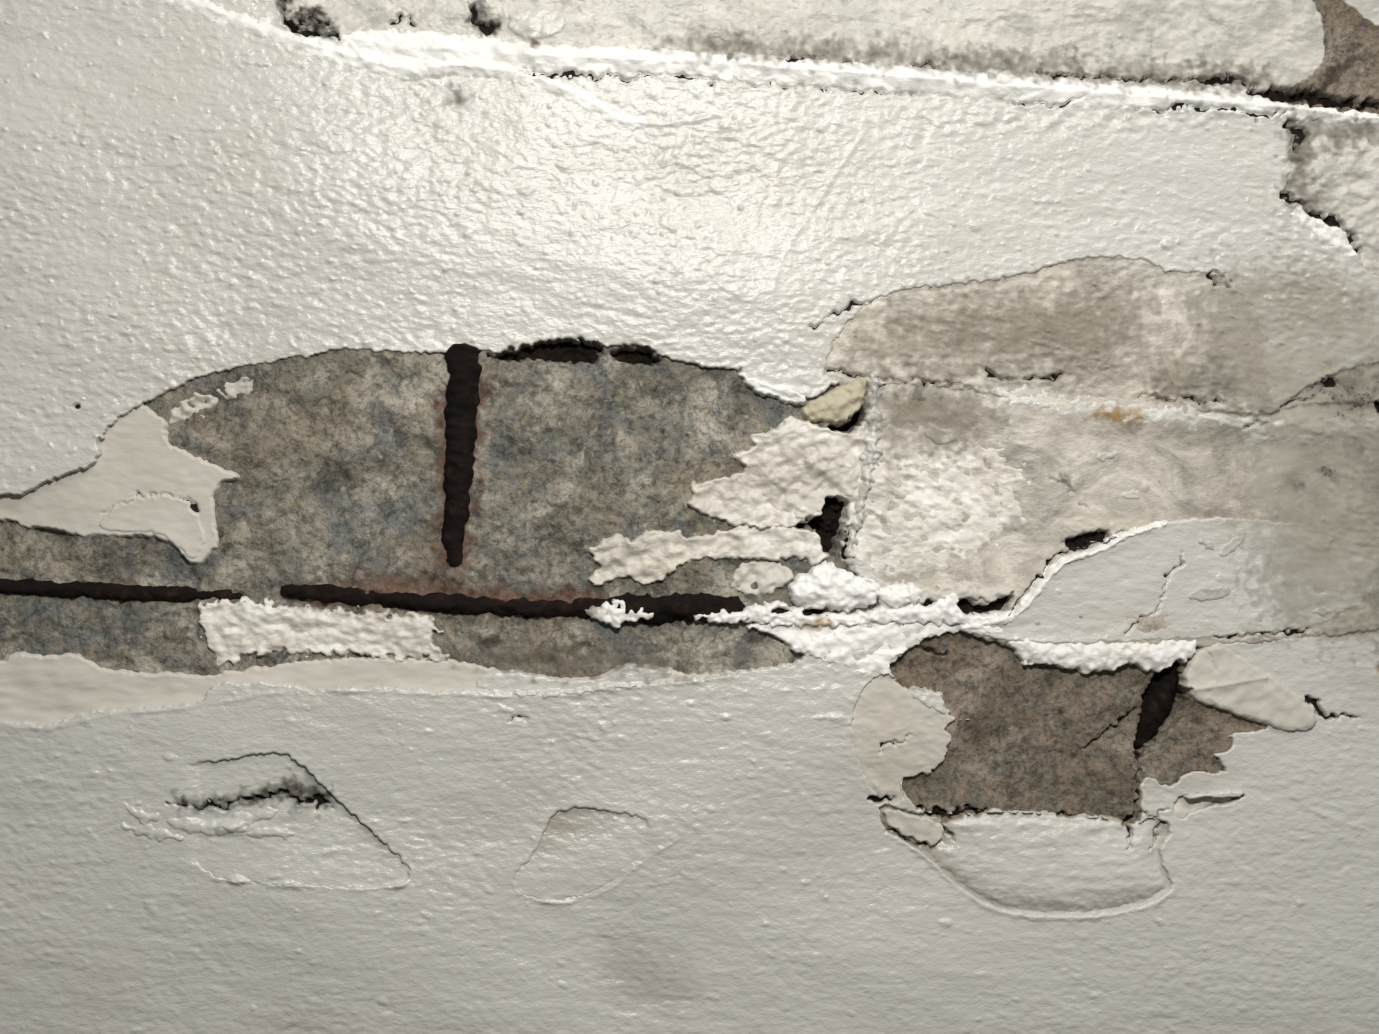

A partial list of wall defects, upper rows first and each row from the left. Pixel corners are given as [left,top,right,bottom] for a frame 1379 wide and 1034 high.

crack [283,0,340,41]
crack [470,7,495,36]
crack [527,70,715,87]
crack [752,58,935,95]
crack [1012,75,1378,119]
peeling [281,0,1379,276]
leakage [991,296,1131,367]
crack [985,369,1062,382]
crack [1245,378,1336,427]
leakage [1211,275,1379,636]
corrosion [341,386,596,619]
spalling [0,256,1379,914]